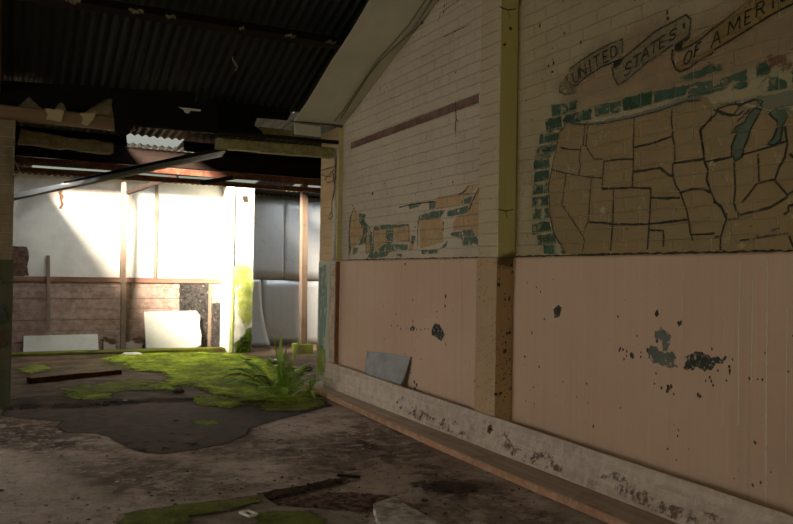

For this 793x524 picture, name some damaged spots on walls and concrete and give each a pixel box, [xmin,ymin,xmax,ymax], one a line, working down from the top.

peeling [45,108,65,122]
peeling [80,113,96,126]
peeling [391,316,446,344]
peeling [618,328,733,395]